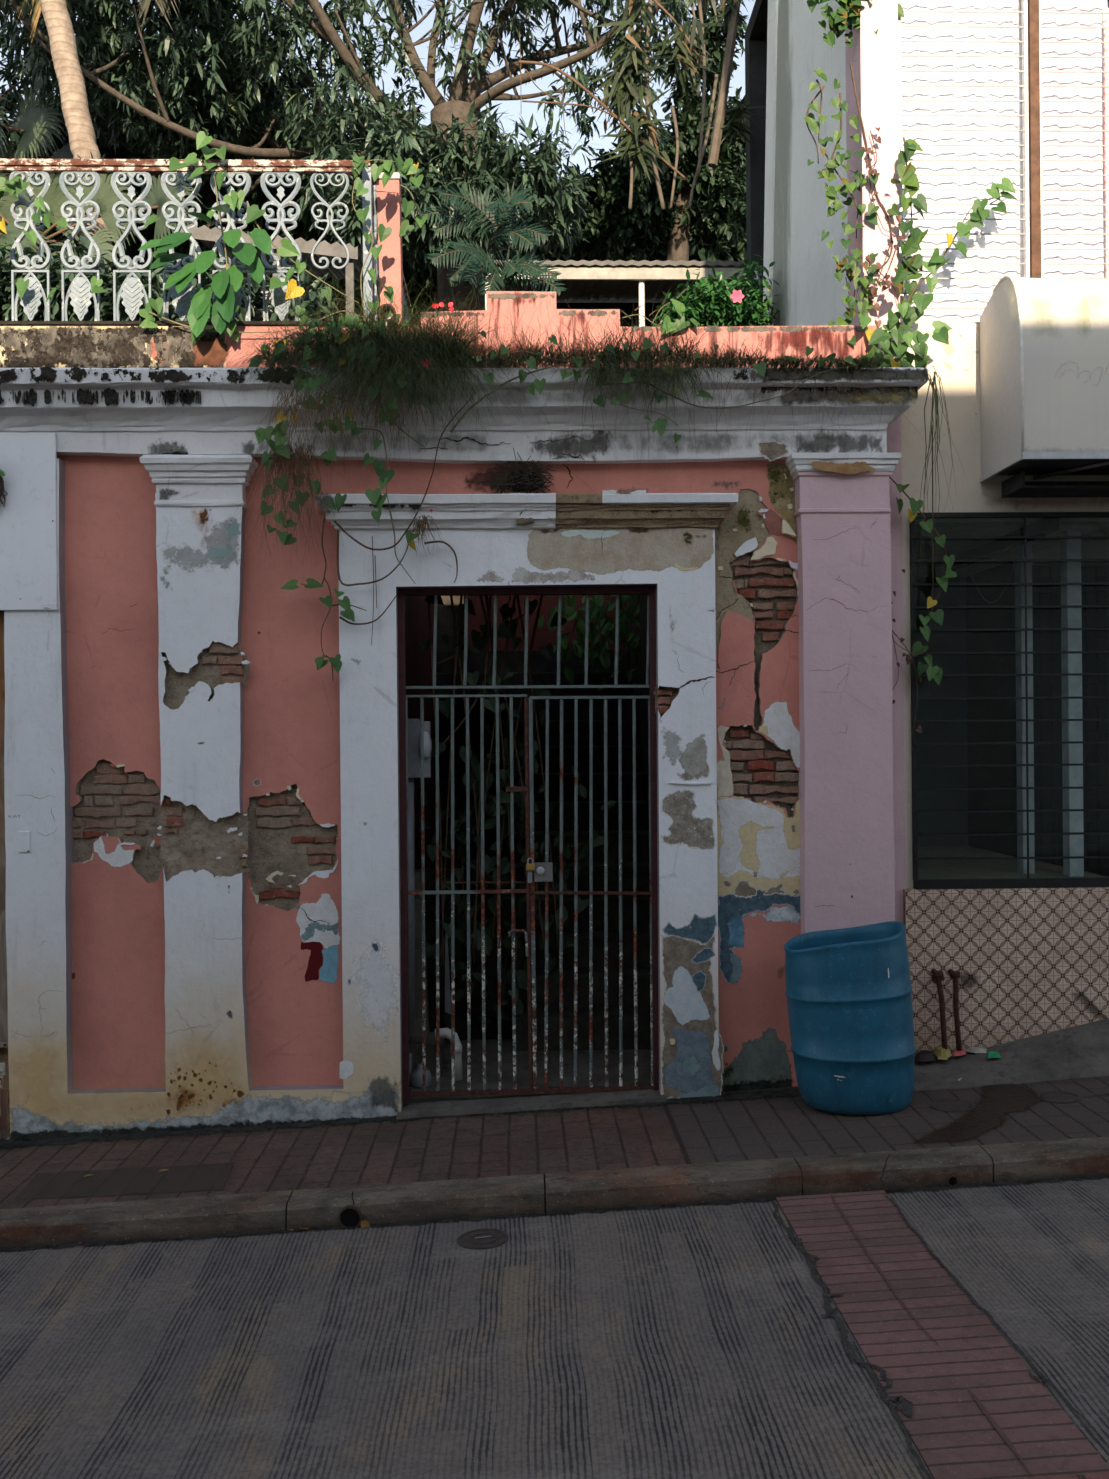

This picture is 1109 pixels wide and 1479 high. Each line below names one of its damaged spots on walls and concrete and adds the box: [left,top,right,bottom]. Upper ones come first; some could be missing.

mould [0,325,297,407]
mould [797,429,882,453]
peeling [812,461,875,474]
peeling [164,519,241,587]
spalling [161,641,251,709]
peeling [477,440,801,1099]
spalling [72,759,340,983]
leakage [8,1060,399,1141]
corrosion [166,1062,245,1115]